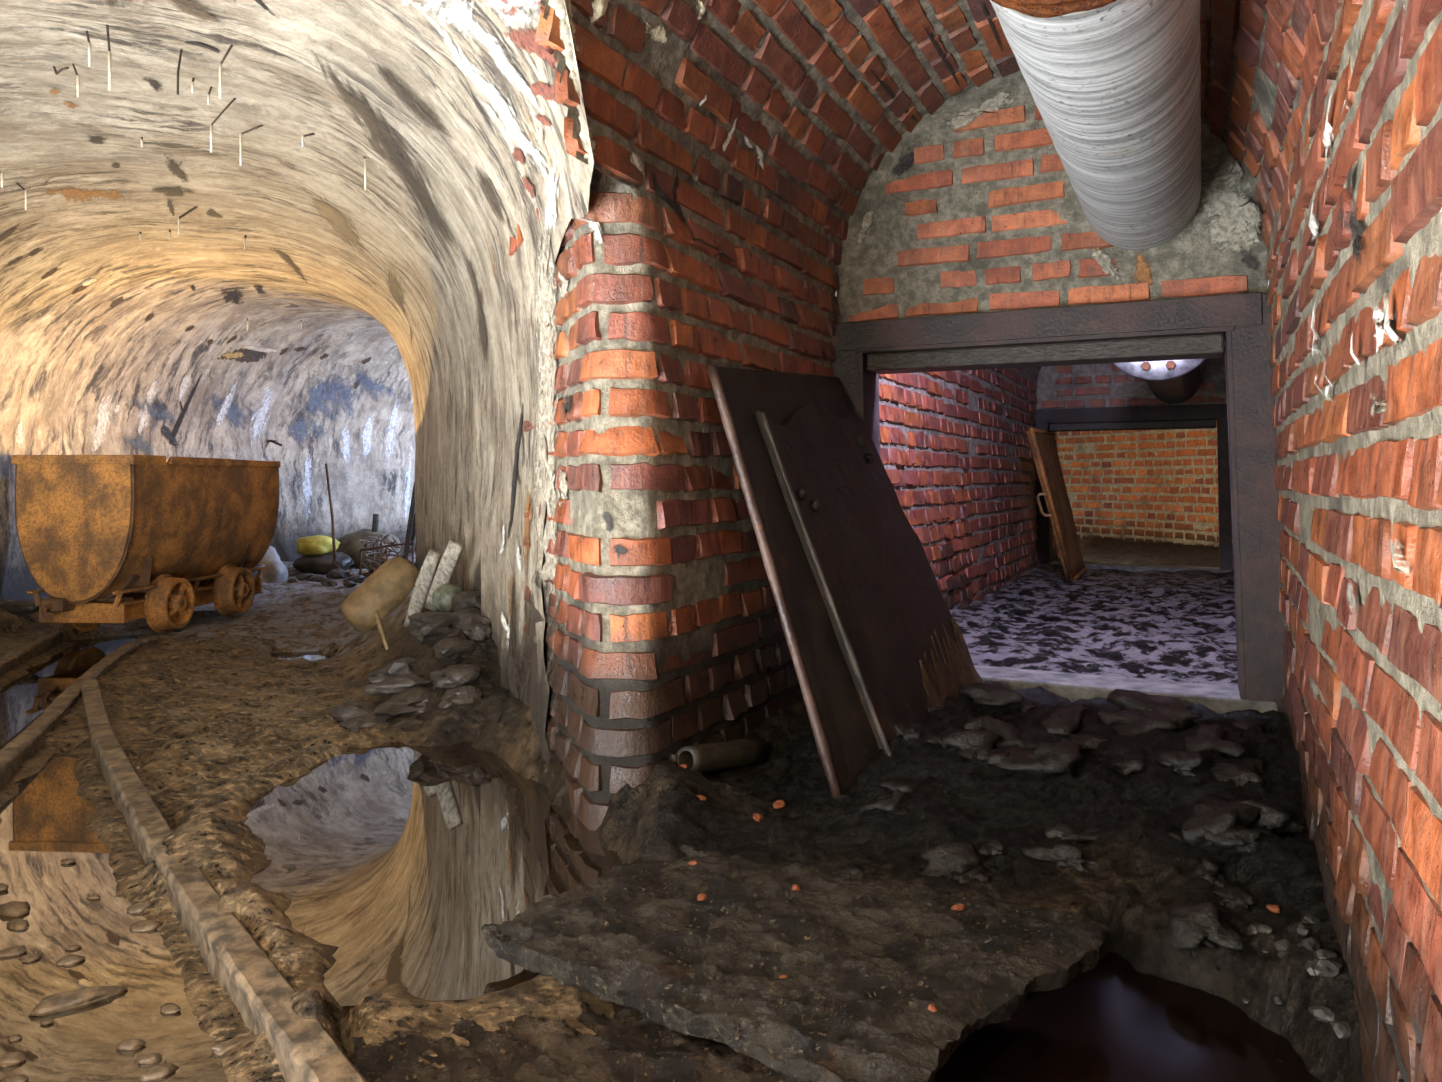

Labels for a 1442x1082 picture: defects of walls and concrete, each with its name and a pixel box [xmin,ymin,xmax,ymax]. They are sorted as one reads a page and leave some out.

crack [234,0,274,16]
flaking render [491,0,559,127]
flaking render [512,148,534,198]